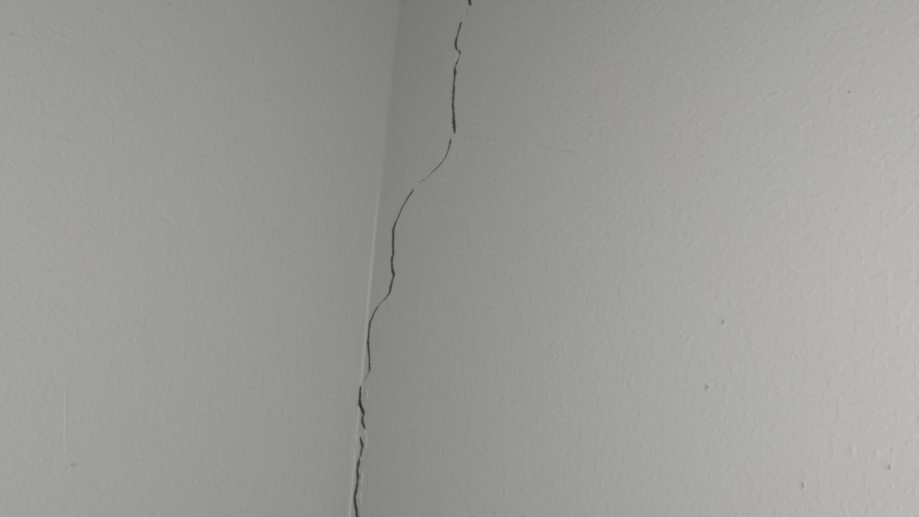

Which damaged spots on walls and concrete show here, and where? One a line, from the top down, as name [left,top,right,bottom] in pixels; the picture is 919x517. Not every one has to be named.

crack [351,0,472,517]